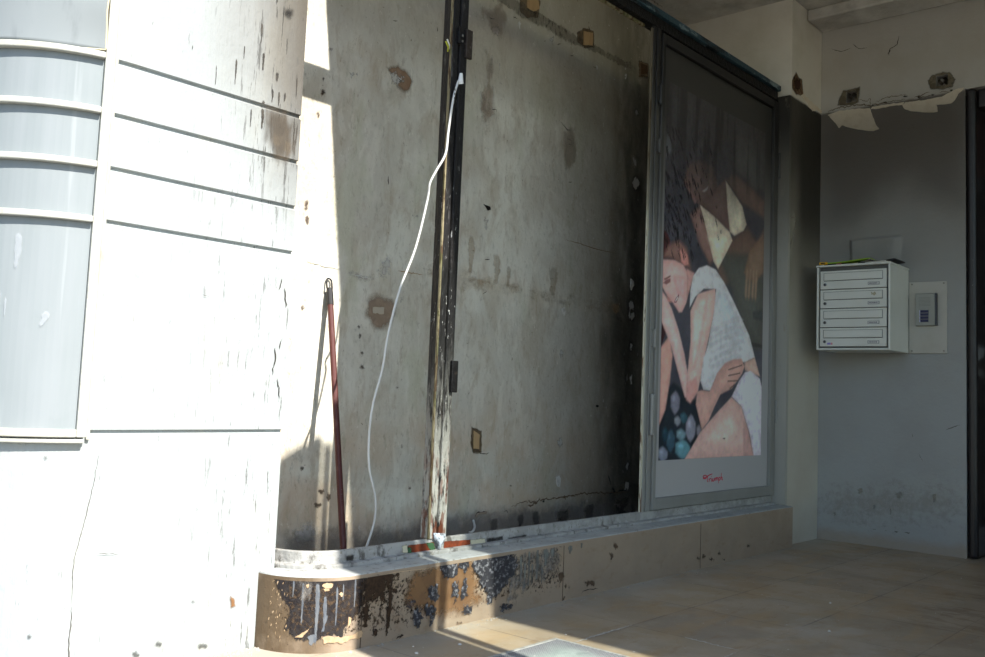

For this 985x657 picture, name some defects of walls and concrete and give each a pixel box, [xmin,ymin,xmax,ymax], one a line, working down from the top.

peeling [792,72,964,131]
damp [446,498,634,536]
crack [68,456,99,657]
damp [288,526,426,551]
peeling [322,617,363,644]